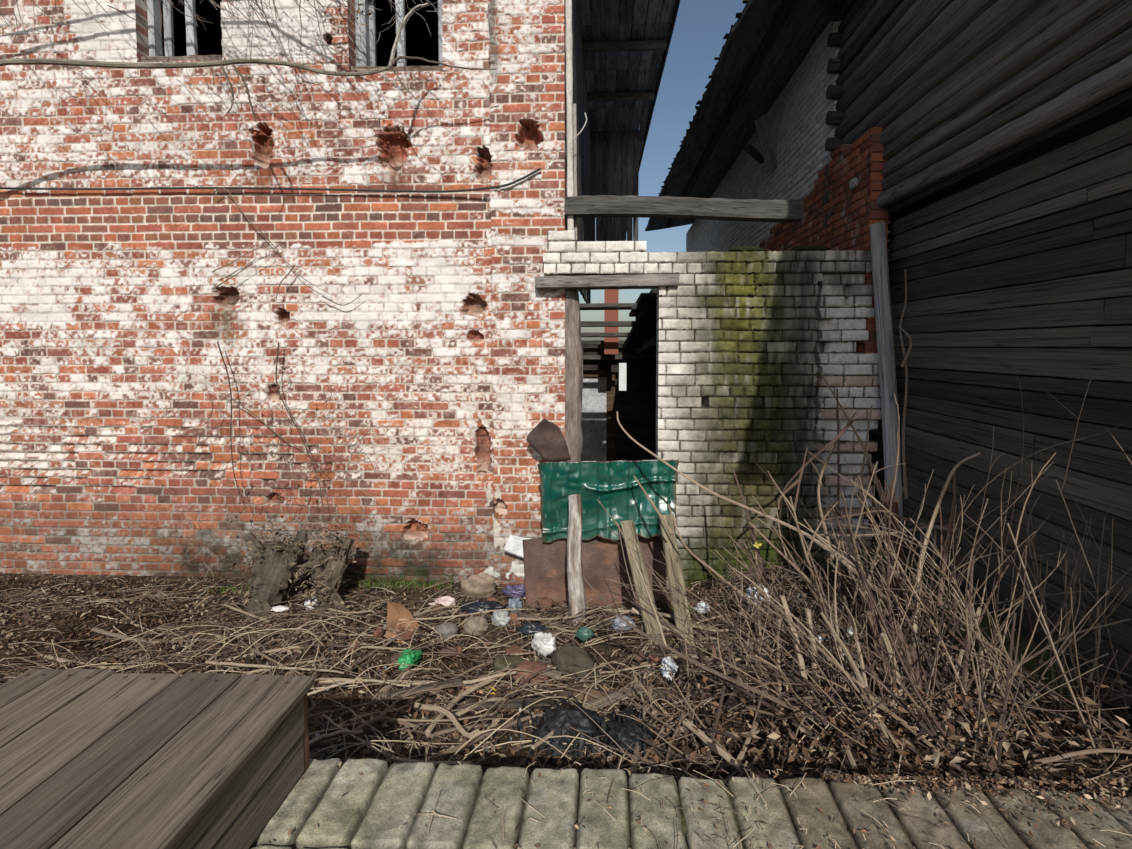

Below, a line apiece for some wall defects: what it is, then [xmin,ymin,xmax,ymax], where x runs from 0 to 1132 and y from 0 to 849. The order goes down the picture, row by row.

peeling [0,0,565,586]
damp [696,256,818,574]